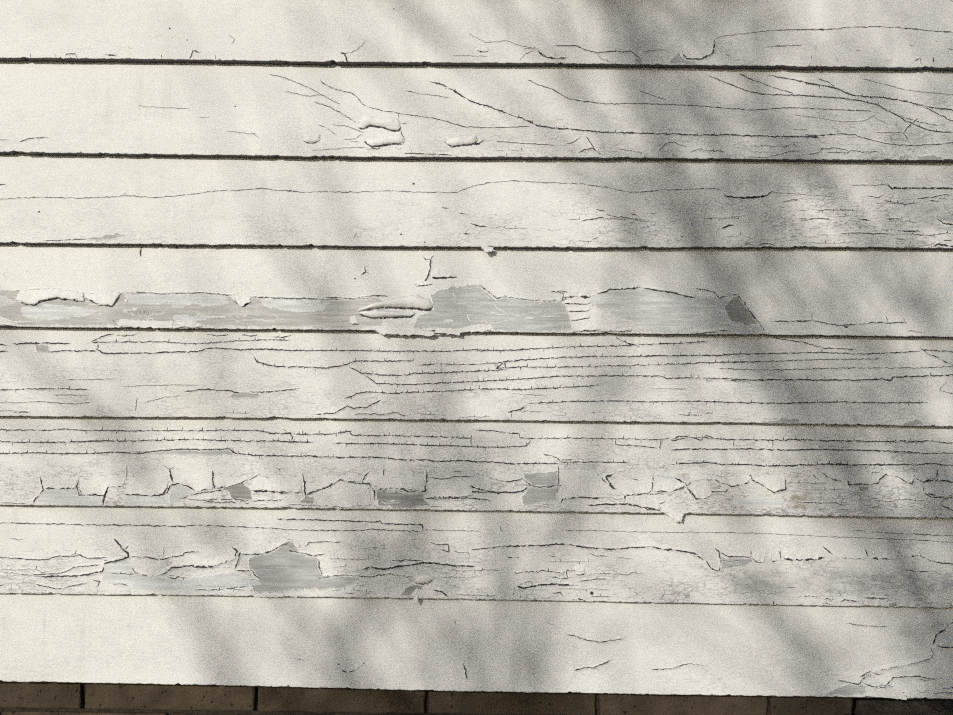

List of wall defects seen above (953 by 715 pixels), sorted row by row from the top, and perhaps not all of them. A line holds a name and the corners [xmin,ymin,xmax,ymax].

crack [269,25,953,159]
crack [0,179,724,201]
crack [784,183,953,227]
crack [415,254,457,287]
peeling [0,281,768,346]
peeling [0,341,100,354]
crack [0,312,953,579]
peeling [1,465,953,522]
peeling [22,537,435,598]
peeling [399,554,642,604]
crack [546,621,626,673]
peeling [822,620,953,700]